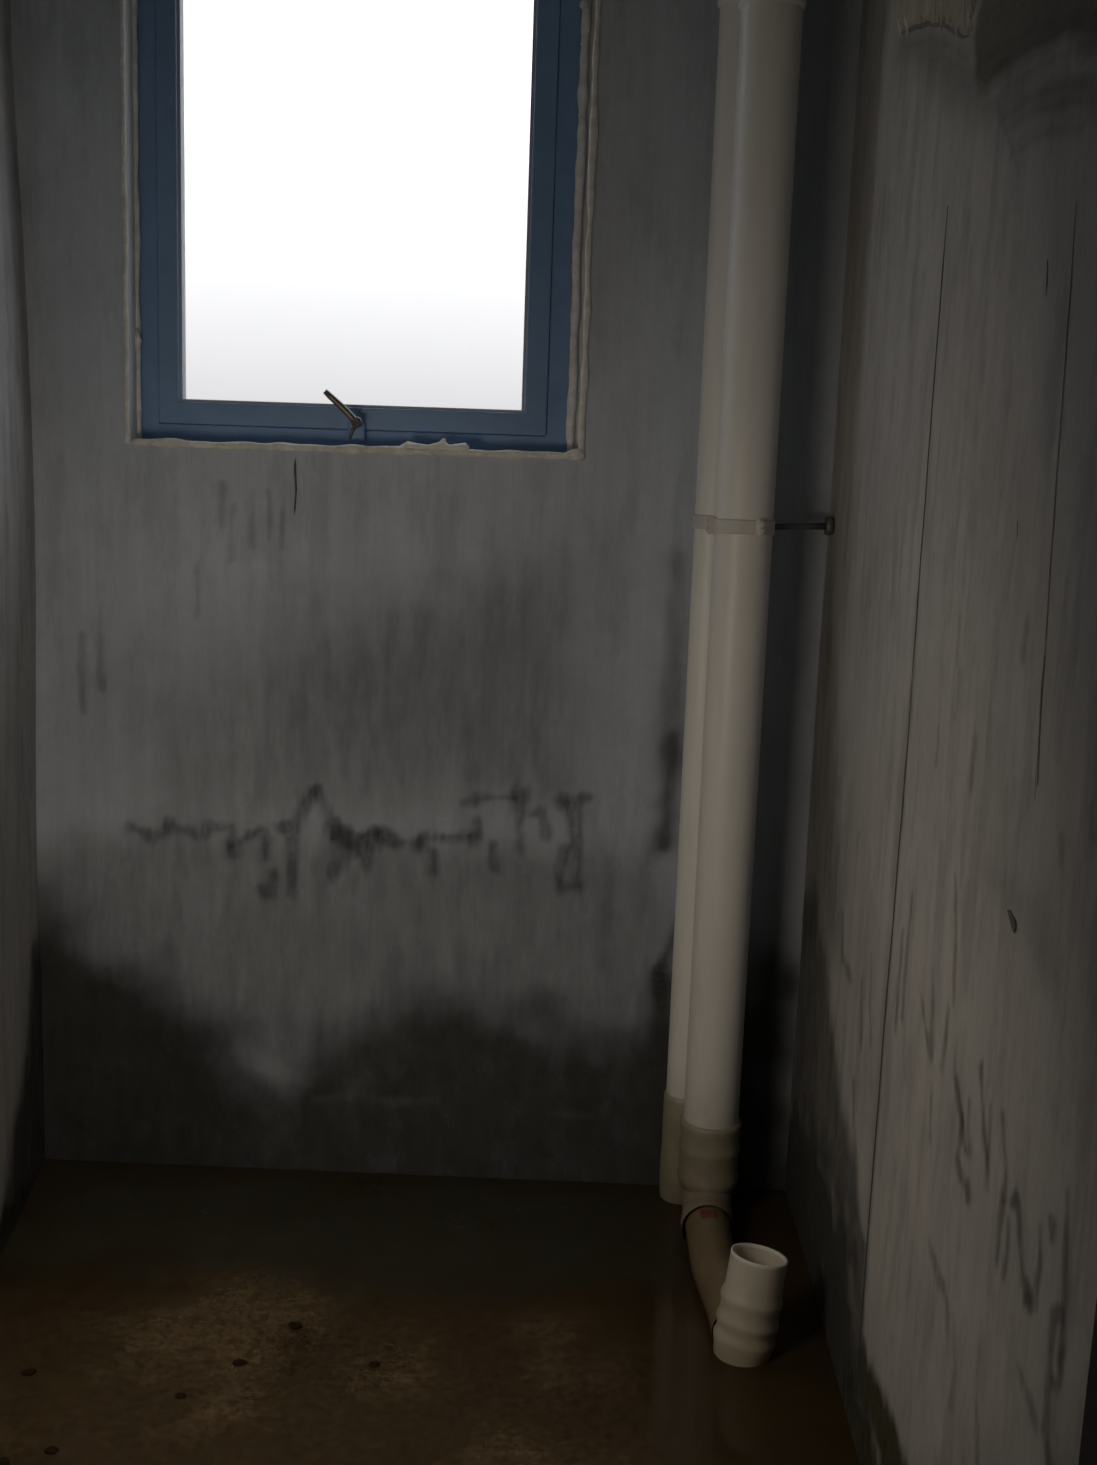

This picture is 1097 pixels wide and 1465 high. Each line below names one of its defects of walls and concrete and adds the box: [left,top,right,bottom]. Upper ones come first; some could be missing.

crack [858,208,948,1351]
damp [39,944,671,1185]
damp [734,897,871,1465]